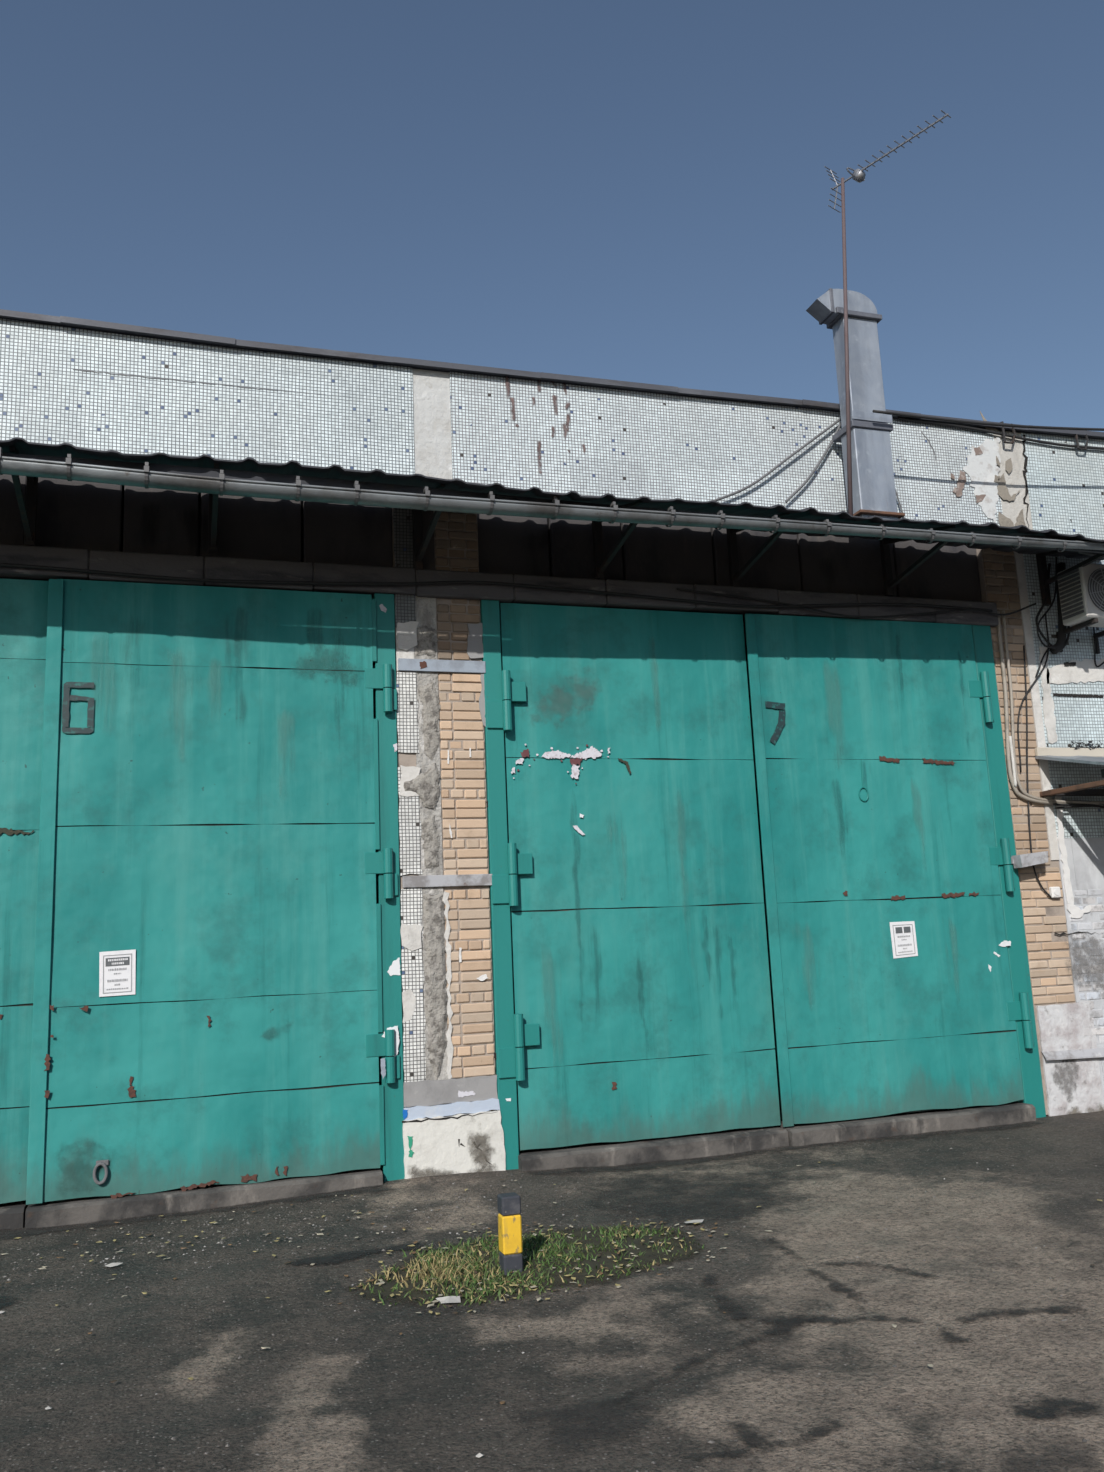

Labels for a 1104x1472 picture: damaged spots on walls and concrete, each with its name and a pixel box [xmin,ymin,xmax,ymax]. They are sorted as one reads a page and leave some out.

rust [505,376,519,427]
rust [532,380,586,474]
flaking render [951,411,1026,527]
spalling [415,625,438,657]
spalling [404,682,441,868]
peeling [511,744,631,784]
peeling [387,958,400,976]
spalling [422,893,448,1080]